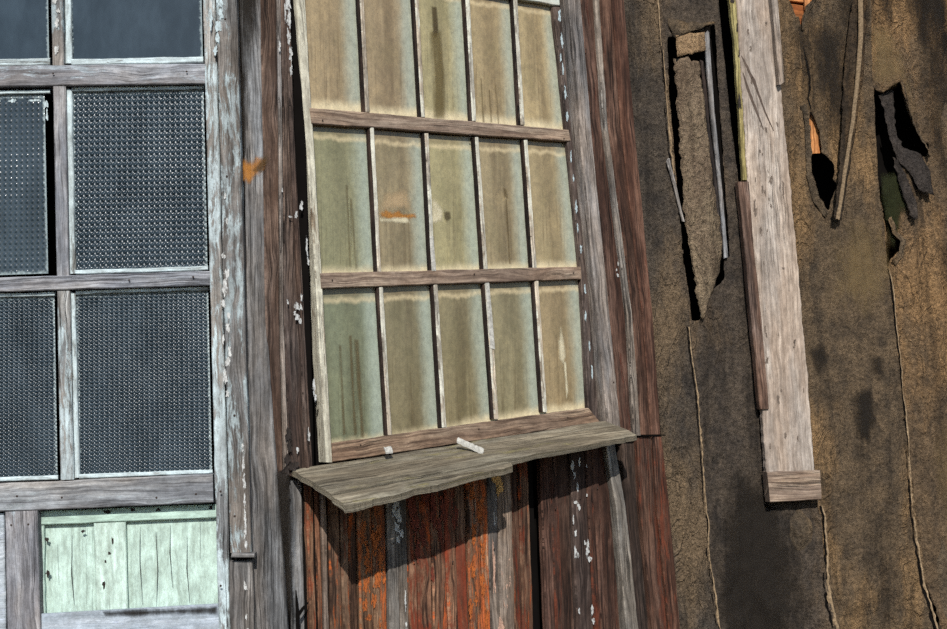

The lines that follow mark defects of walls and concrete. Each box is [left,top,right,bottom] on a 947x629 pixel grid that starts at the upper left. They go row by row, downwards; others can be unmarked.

peeling [209,0,224,56]
peeling [279,0,293,75]
peeling [360,518,386,629]
peeling [392,501,403,543]
peeling [468,481,511,629]
peeling [571,458,592,562]